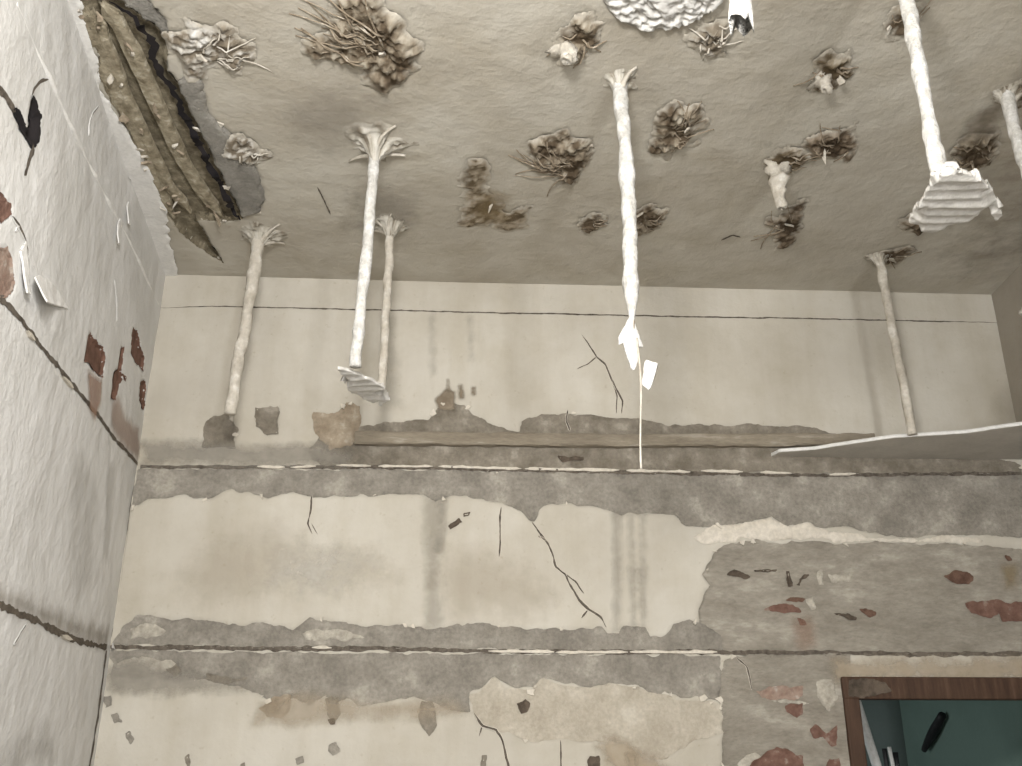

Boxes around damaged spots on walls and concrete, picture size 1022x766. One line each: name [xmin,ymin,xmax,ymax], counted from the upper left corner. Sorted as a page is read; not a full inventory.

spalling [14,95,42,149]
flaking render [77,0,265,263]
flaking render [0,192,12,223]
flaking render [84,327,146,410]
crack [0,280,1022,533]
crack [496,507,504,556]
peeling [109,401,1022,766]
crack [0,522,1022,766]
flaking render [103,696,134,744]